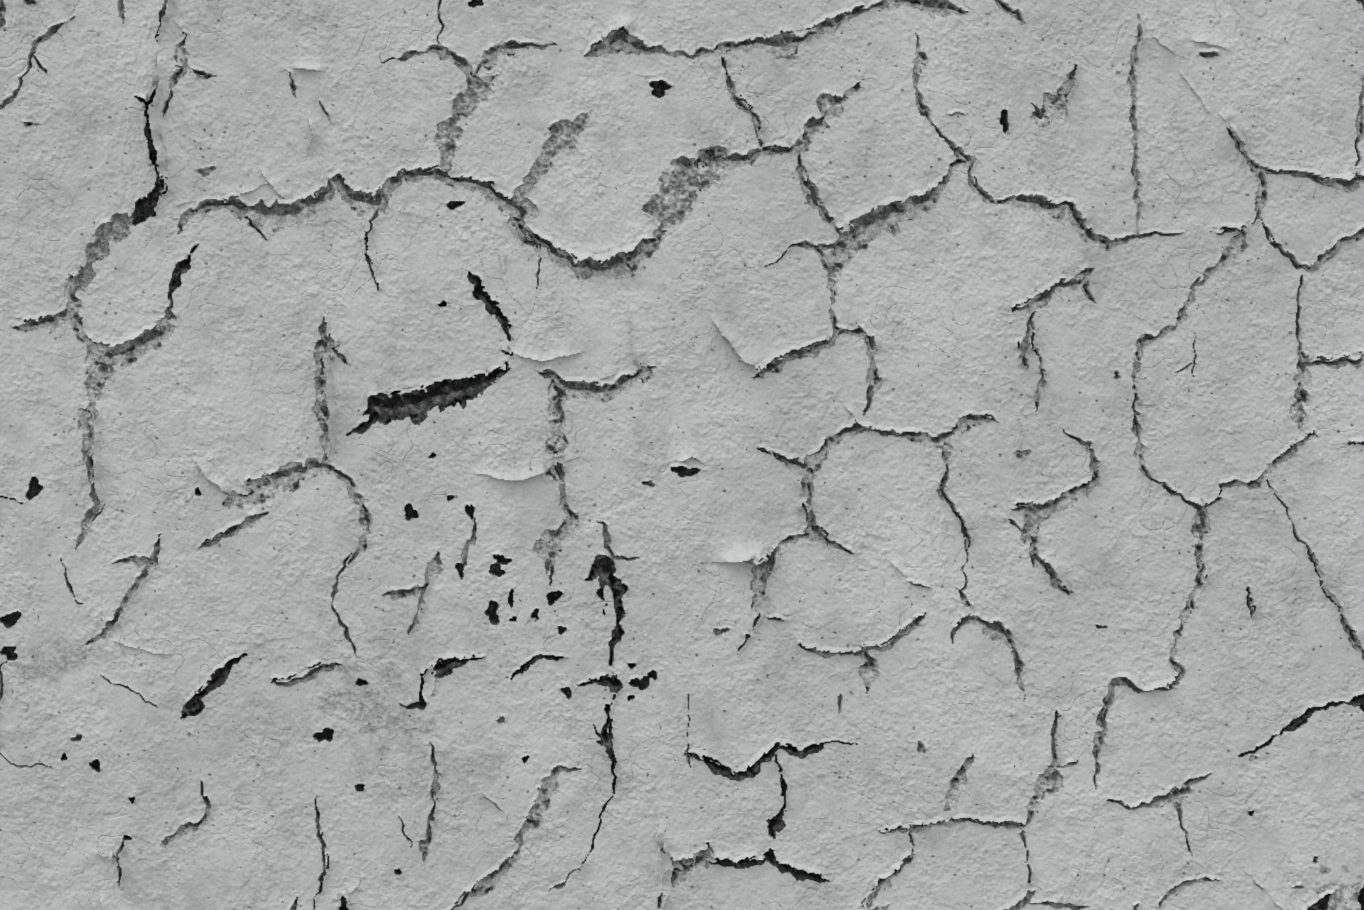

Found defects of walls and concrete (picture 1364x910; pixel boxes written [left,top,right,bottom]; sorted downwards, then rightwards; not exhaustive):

crack [0,17,74,109]
crack [13,0,1185,720]
spalling [404,503,419,521]
crack [191,272,656,910]
spalling [447,495,477,580]
spalling [489,554,512,577]
spalling [484,565,564,625]
crack [849,75,1364,910]
spalling [627,663,657,702]
crack [164,779,215,842]
crack [655,694,857,910]
spalling [1246,855,1364,910]